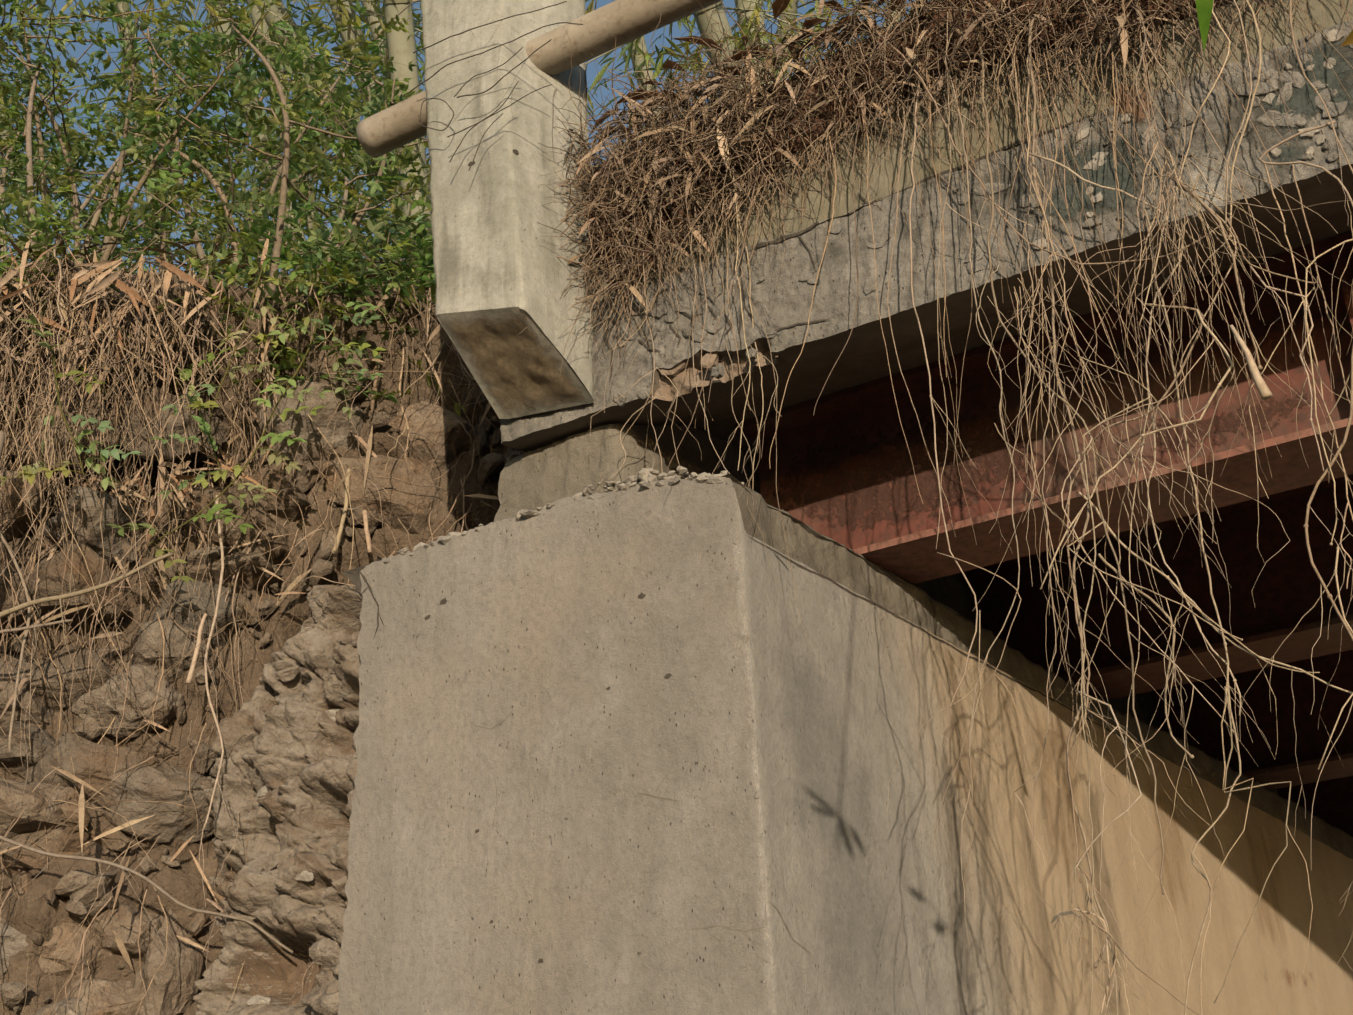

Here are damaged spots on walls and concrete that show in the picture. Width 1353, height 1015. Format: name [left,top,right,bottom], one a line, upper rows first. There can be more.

crack [550,89,558,158]
rust [1146,392,1313,453]
rust [766,406,1038,531]